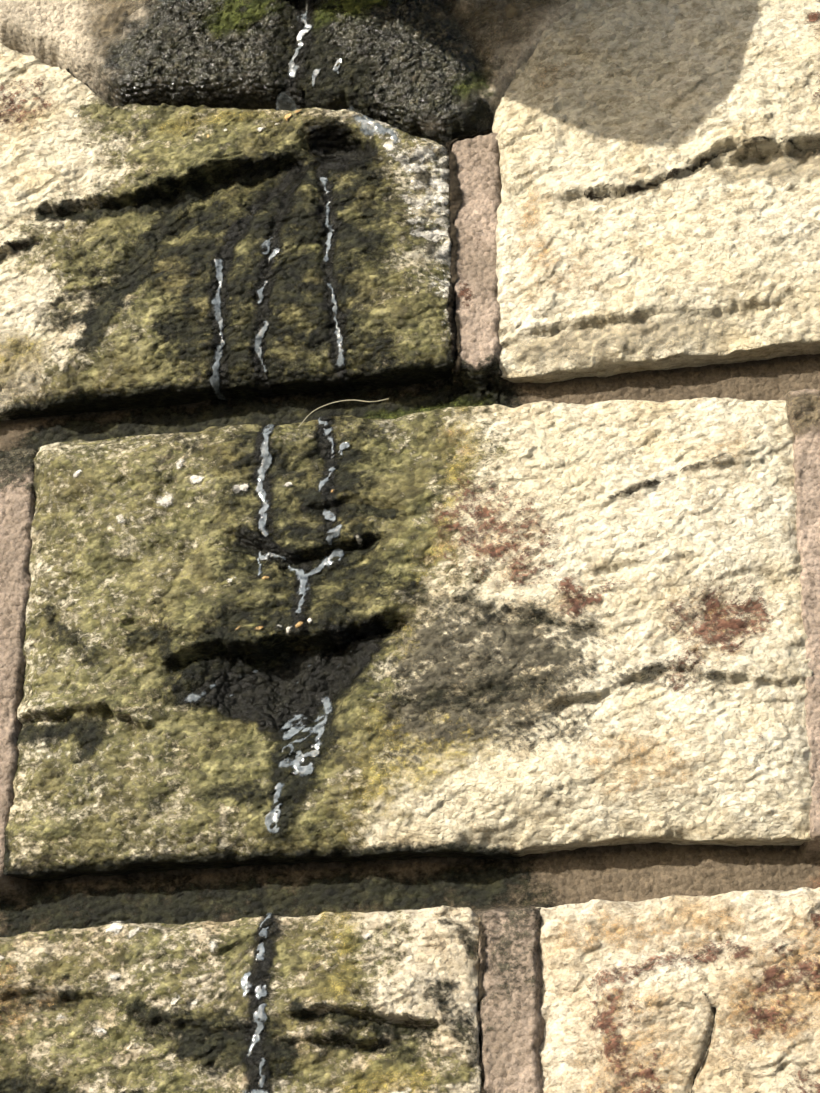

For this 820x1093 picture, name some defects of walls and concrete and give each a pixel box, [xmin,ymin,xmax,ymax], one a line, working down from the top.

water stain [236,415,349,635]
water stain [183,614,387,849]
water stain [241,913,281,1093]
crack [691,991,716,1093]